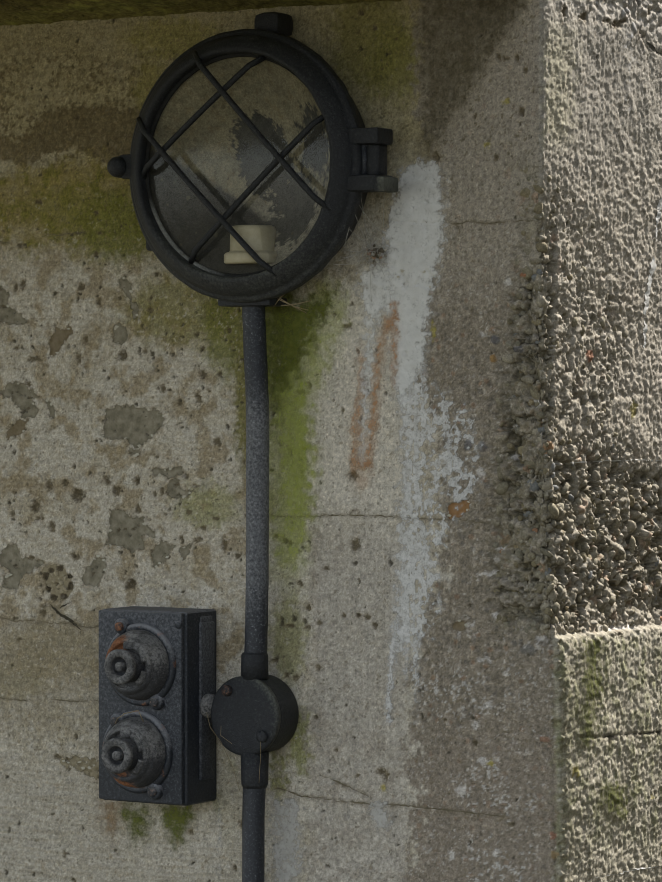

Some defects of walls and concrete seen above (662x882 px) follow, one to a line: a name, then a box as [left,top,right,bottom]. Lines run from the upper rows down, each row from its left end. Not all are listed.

crack [432,220,537,236]
peeling [0,286,27,325]
peeling [48,324,73,357]
peeling [0,381,57,440]
peeling [103,404,164,457]
corrosion [351,303,398,468]
damp [356,158,483,723]
peeling [106,509,191,568]
peeling [0,544,72,601]
crack [582,731,661,744]
crack [276,776,500,817]